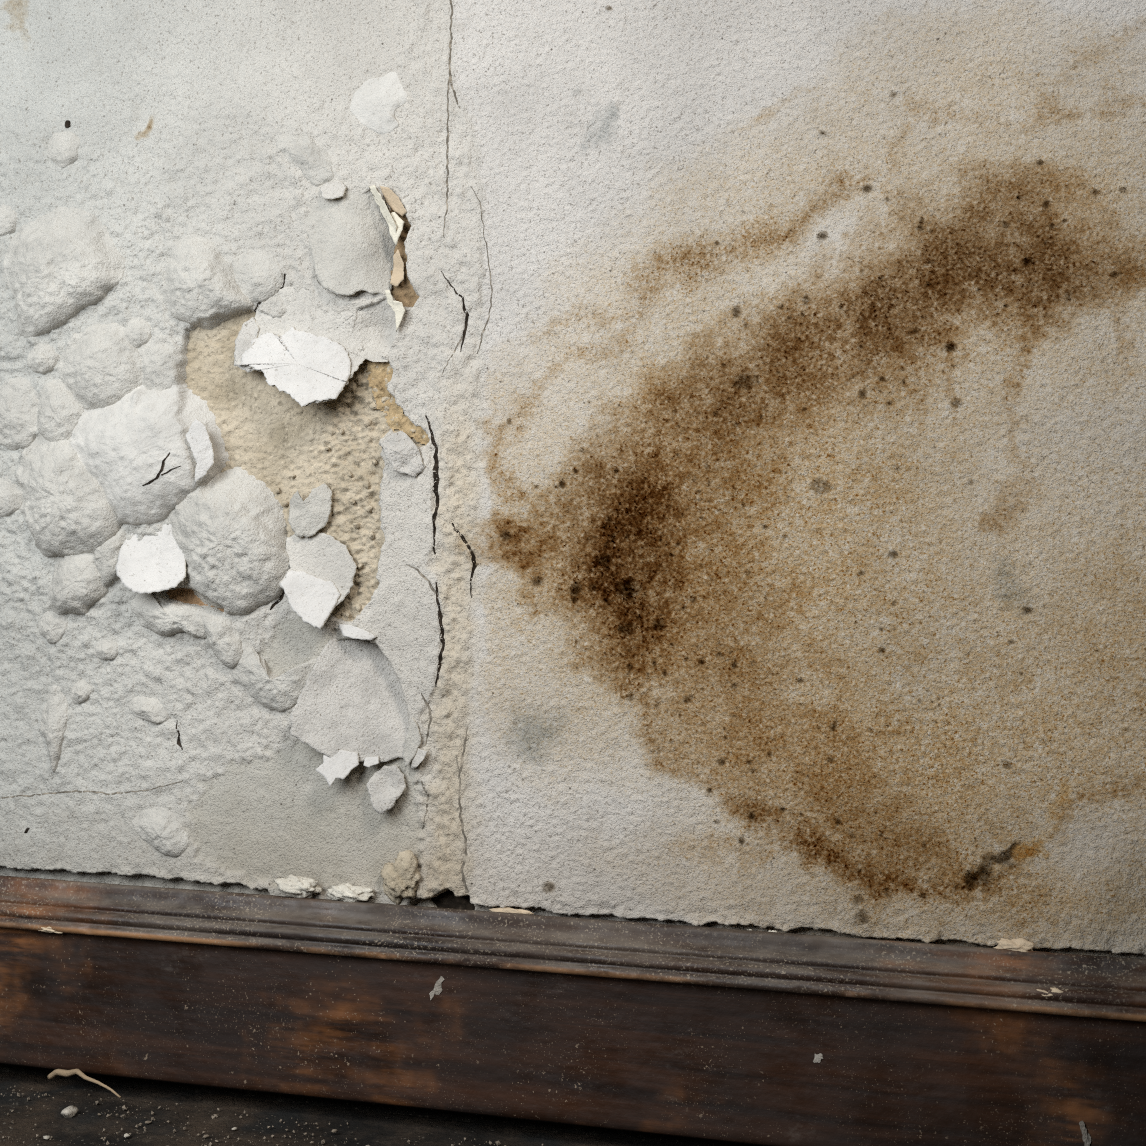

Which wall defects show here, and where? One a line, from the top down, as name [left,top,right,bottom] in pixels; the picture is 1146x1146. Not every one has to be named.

crack [441,0,493,377]
spalling [185,180,430,814]
crack [406,415,481,746]
damp [482,159,1146,928]
crack [421,781,429,829]
crack [455,727,468,893]